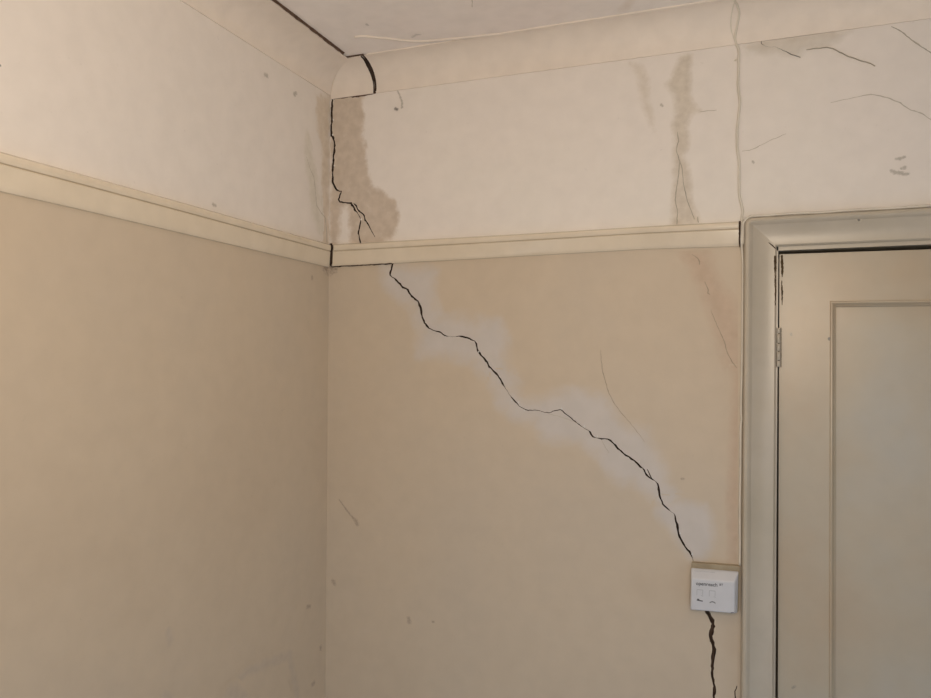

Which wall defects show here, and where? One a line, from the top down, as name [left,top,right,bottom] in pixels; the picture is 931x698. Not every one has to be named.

crack [761,42,875,66]
crack [891,26,931,53]
leakage [302,90,403,244]
leakage [626,51,704,225]
crack [675,132,699,224]
crack [831,94,931,120]
crack [272,0,693,559]
leakage [672,249,738,565]
crack [705,611,737,698]